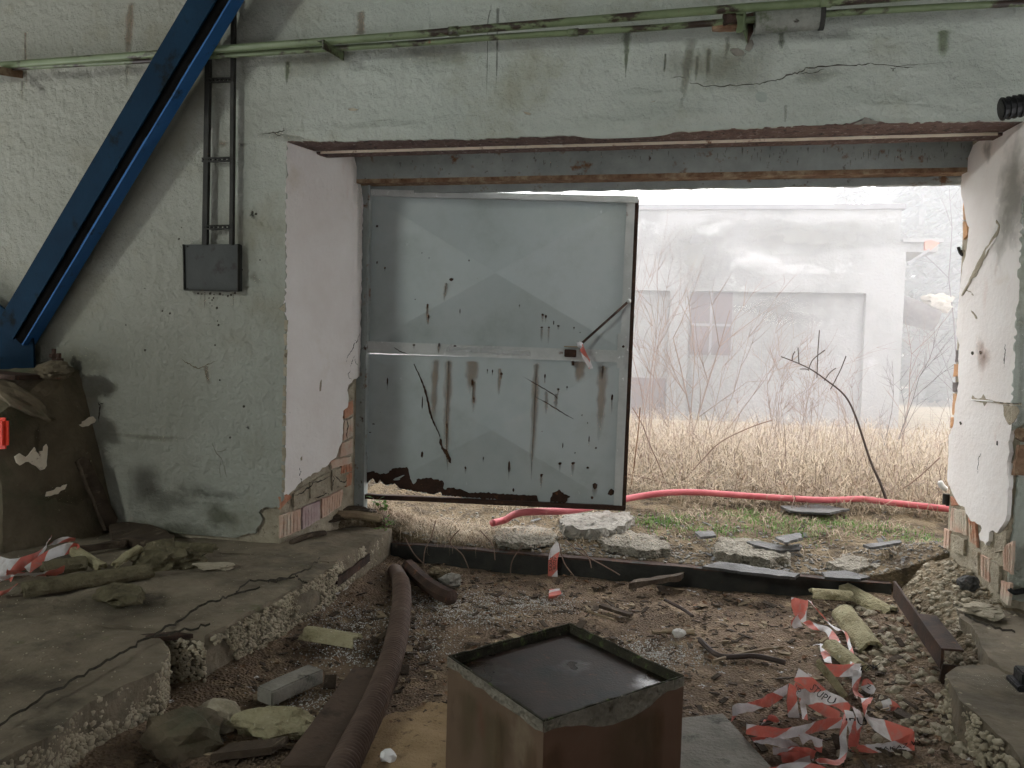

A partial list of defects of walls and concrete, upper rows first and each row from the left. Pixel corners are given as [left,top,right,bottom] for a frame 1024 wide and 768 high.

crack [674,62,943,87]
flaking render [278,302,354,538]
flaking render [950,350,982,428]
flaking render [858,496,1016,622]
crack [0,557,320,726]